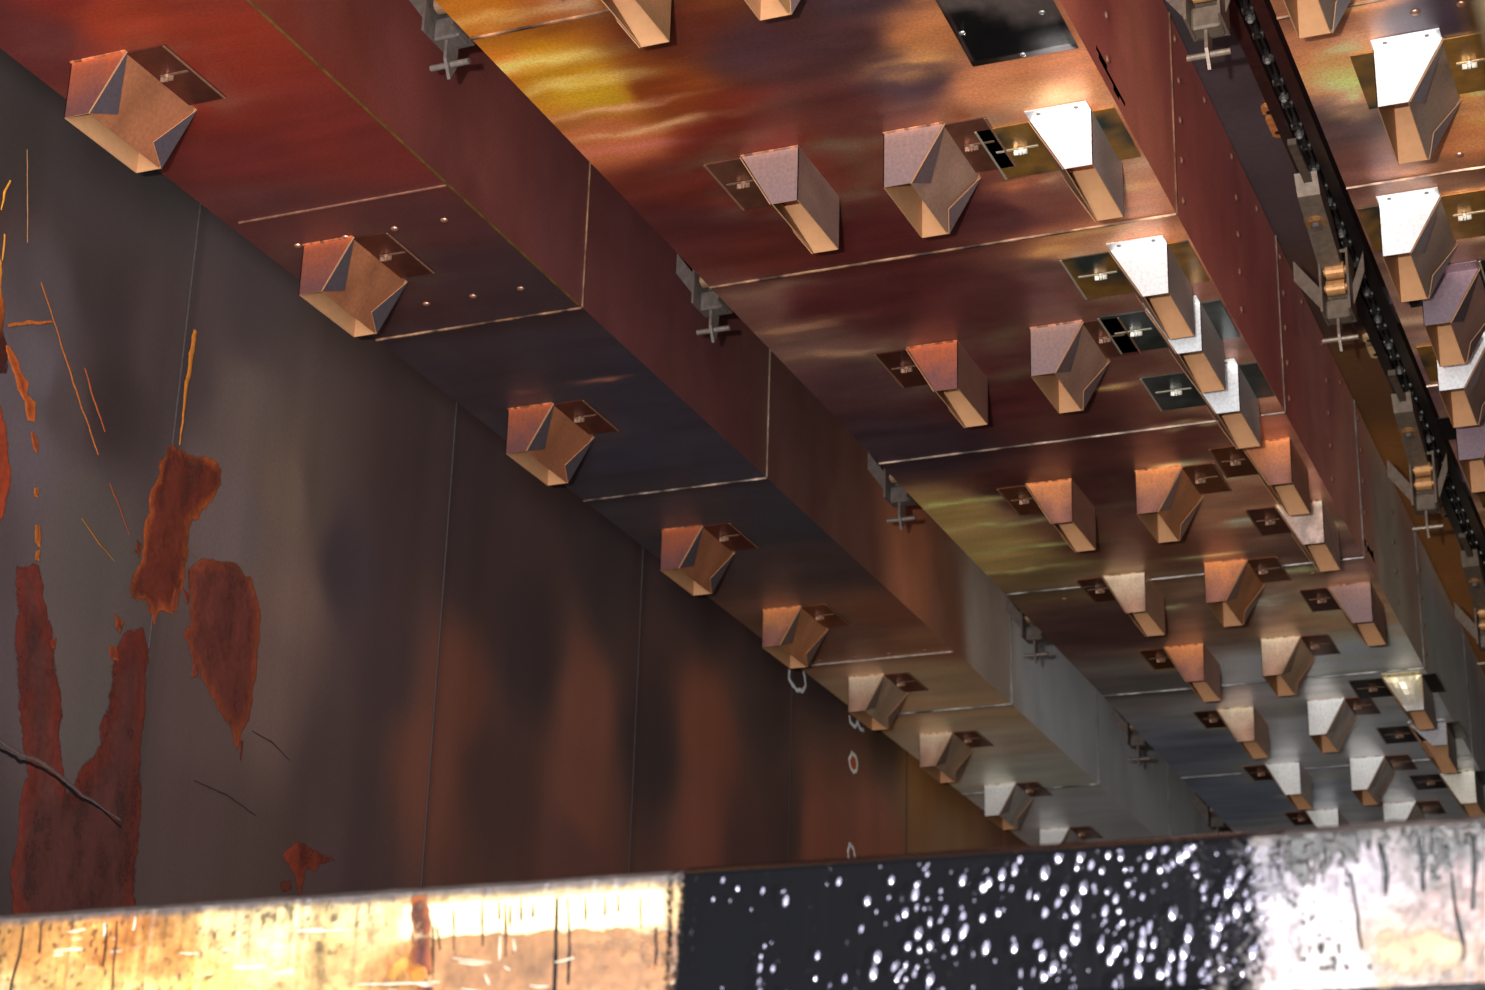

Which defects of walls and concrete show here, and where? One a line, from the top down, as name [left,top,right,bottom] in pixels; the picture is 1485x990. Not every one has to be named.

rust [10,329,261,914]
crack [0,739,121,828]
crack [194,780,256,816]
crack [252,731,290,761]
rust [389,894,441,990]